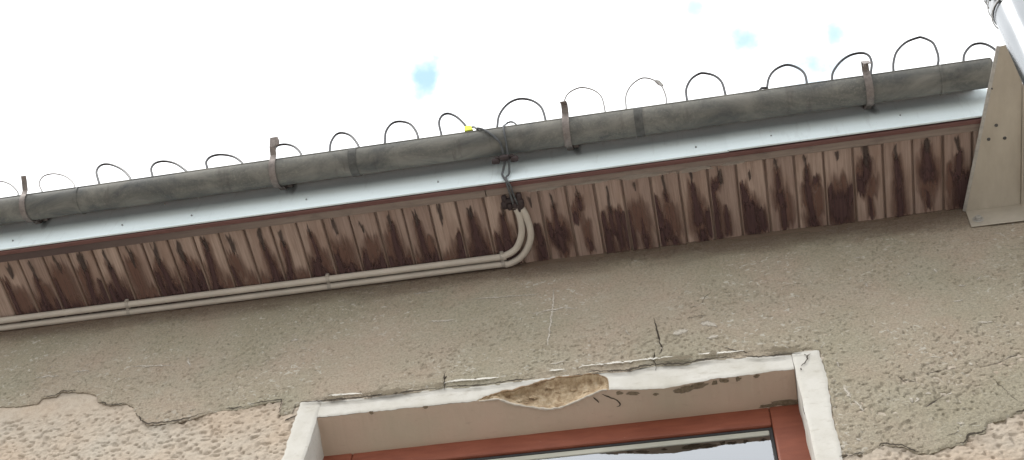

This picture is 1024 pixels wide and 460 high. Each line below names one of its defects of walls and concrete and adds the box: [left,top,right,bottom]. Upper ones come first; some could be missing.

water stain [0,145,971,335]
flaking render [327,387,411,399]
spalling [476,350,744,410]
crack [589,319,810,407]